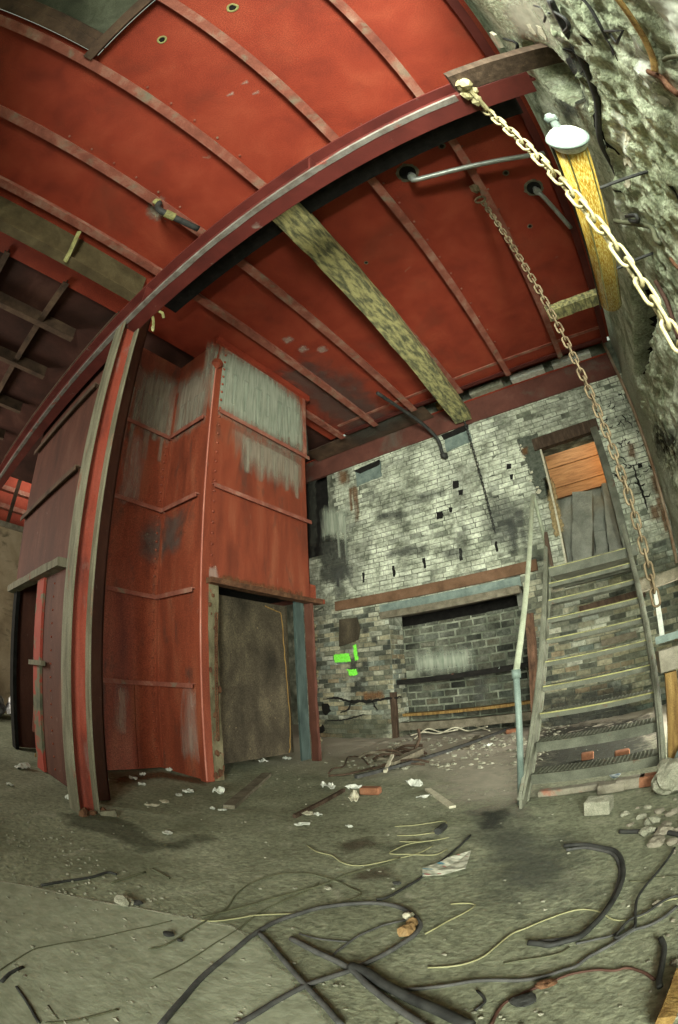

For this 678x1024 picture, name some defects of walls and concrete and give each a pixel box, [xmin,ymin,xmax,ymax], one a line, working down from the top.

crack [595,393,651,511]
crack [325,696,402,721]